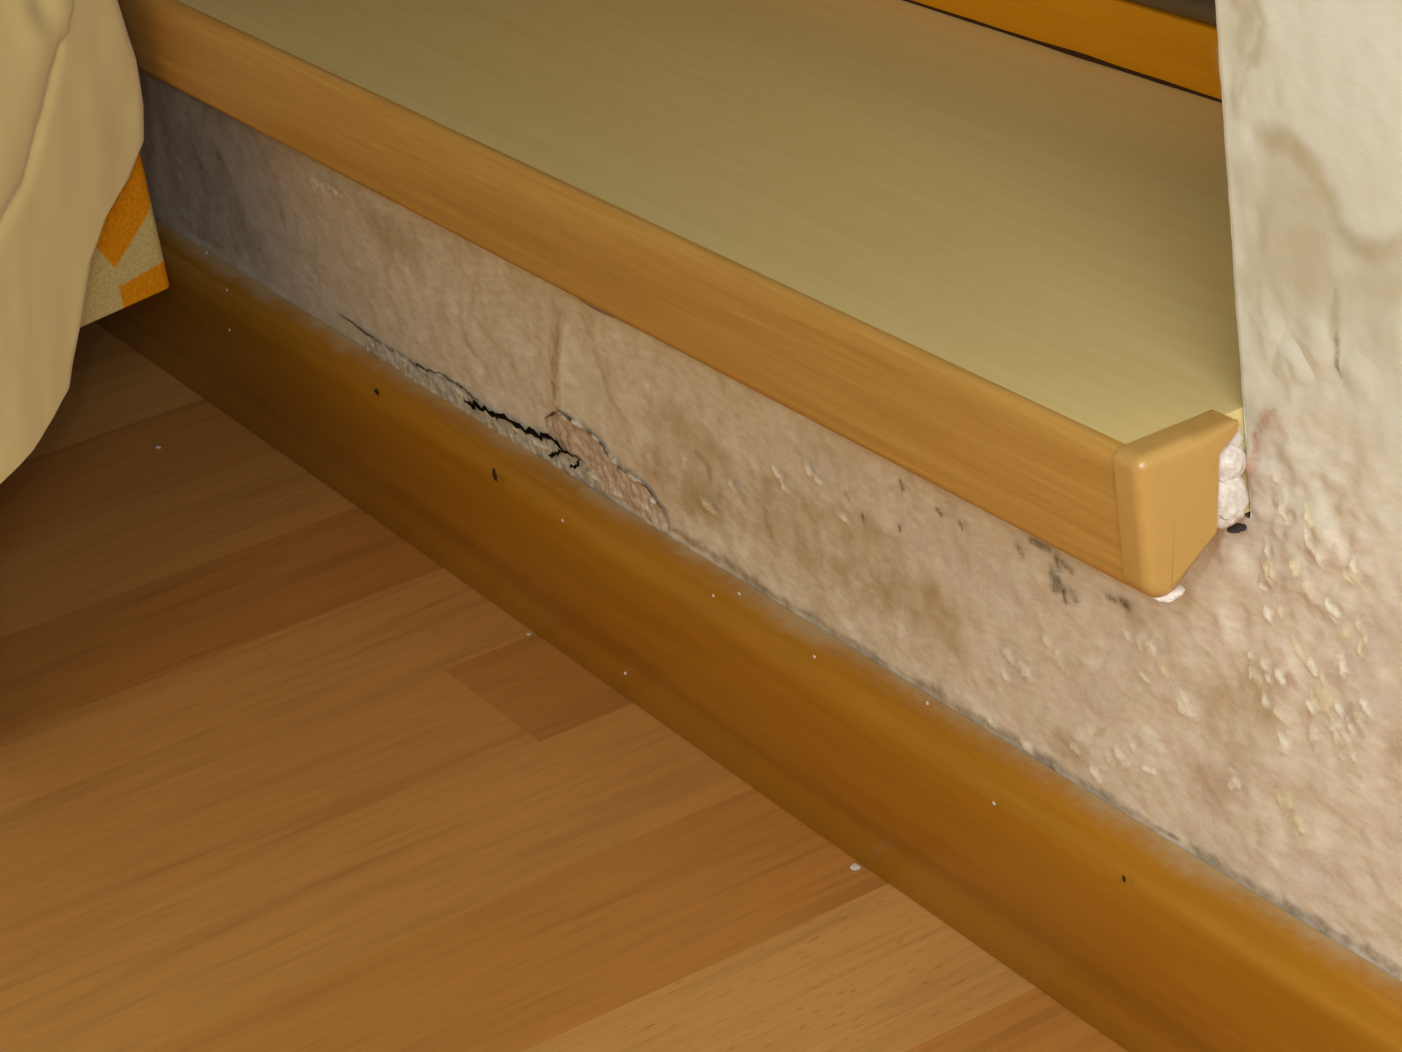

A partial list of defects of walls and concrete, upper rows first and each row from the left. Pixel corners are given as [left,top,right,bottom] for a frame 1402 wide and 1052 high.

crack [340,314,581,469]
spalling [366,336,669,532]